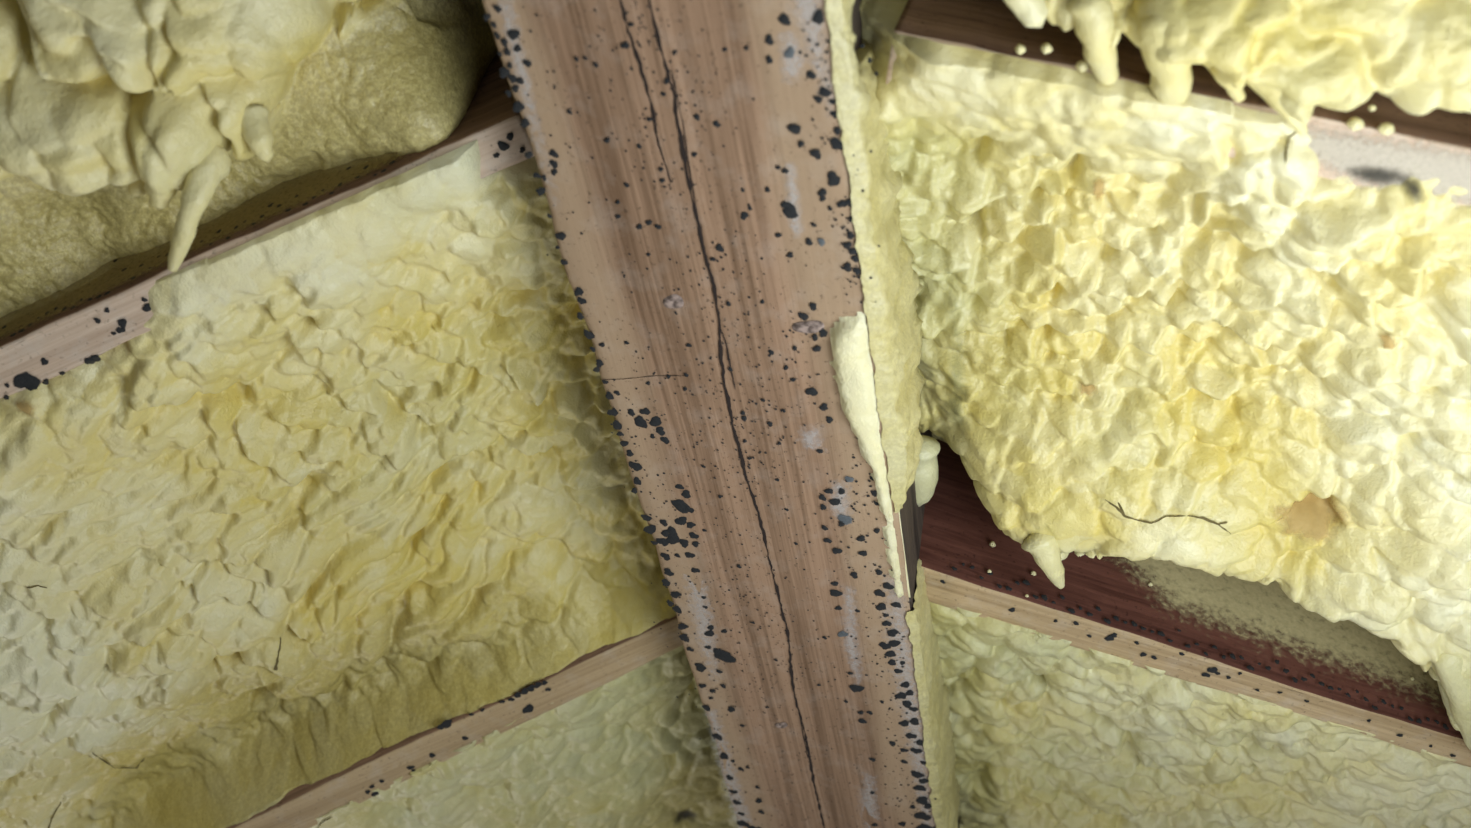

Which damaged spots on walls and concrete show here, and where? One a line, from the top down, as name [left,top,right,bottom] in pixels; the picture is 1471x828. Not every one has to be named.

leakage [2,291,127,337]
leakage [84,355,101,364]
leakage [3,358,65,414]
leakage [483,0,936,828]
crack [620,0,824,827]
leakage [1279,493,1343,540]
leakage [940,563,1449,737]
leakage [469,680,551,716]
leakage [437,719,468,740]